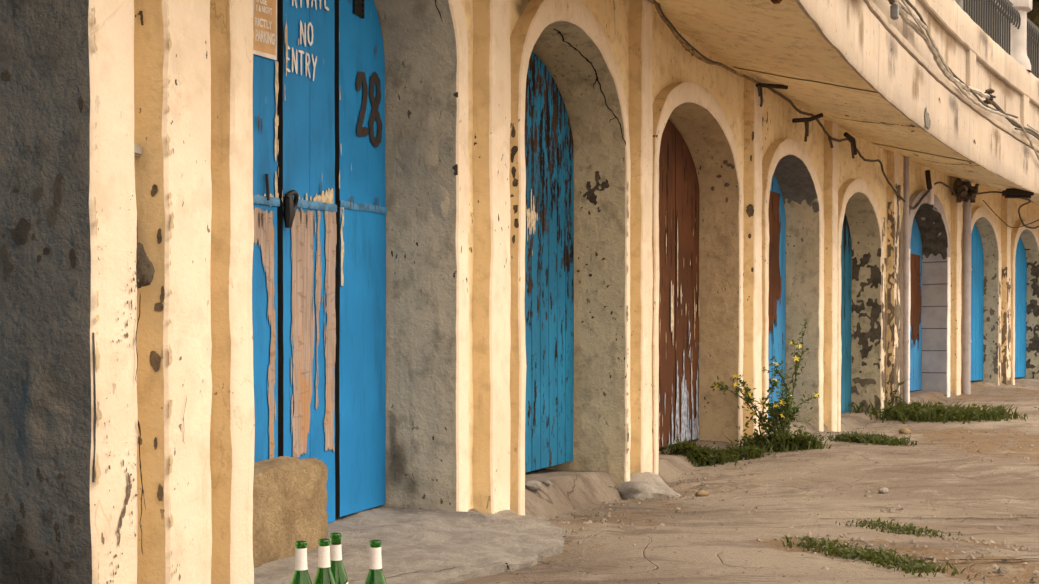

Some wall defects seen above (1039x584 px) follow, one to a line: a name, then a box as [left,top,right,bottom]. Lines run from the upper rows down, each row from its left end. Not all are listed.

crack [554,29,626,146]
peeling [253,23,299,459]
peeling [851,183,901,411]
spalling [914,204,948,260]
peeling [983,267,1011,385]
peeling [1025,249,1039,379]